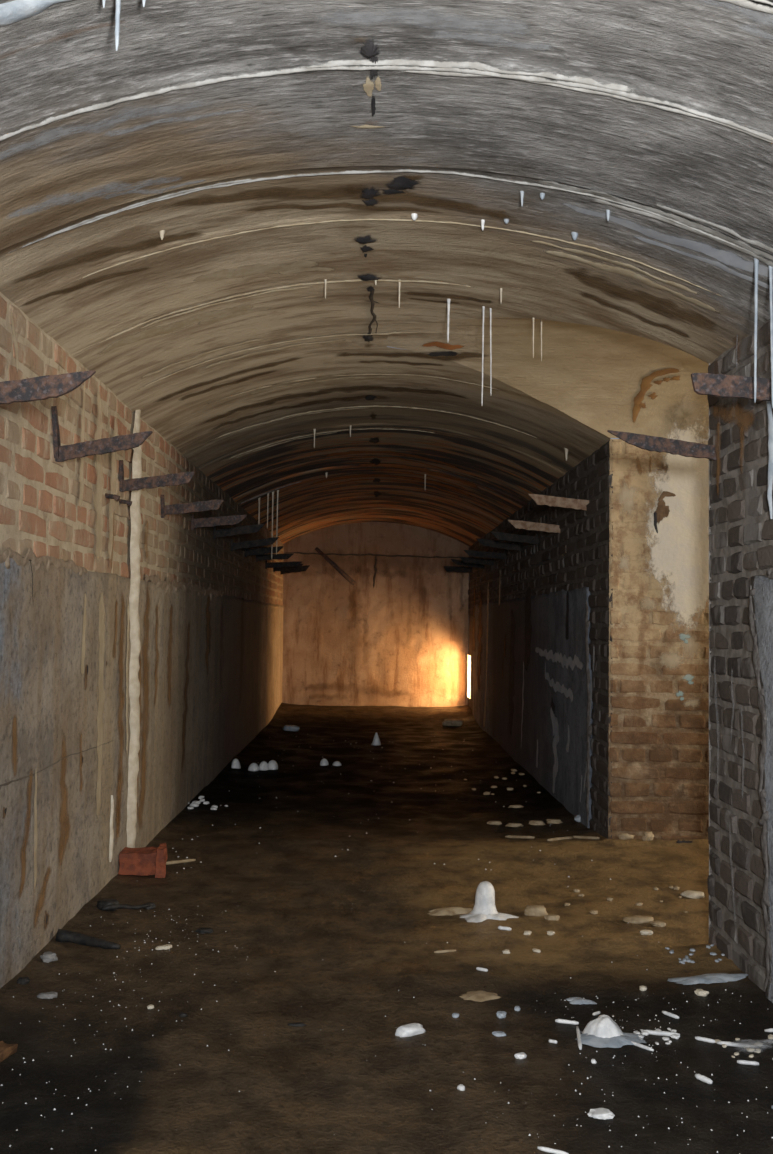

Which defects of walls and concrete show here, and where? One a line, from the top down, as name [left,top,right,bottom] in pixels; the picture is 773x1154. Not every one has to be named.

efflorescence [0,0,71,26]
leakage [9,169,773,338]
leakage [99,260,492,354]
crack [368,286,378,336]
leakage [81,382,118,442]
peeling [643,402,709,668]
leakage [79,410,142,862]